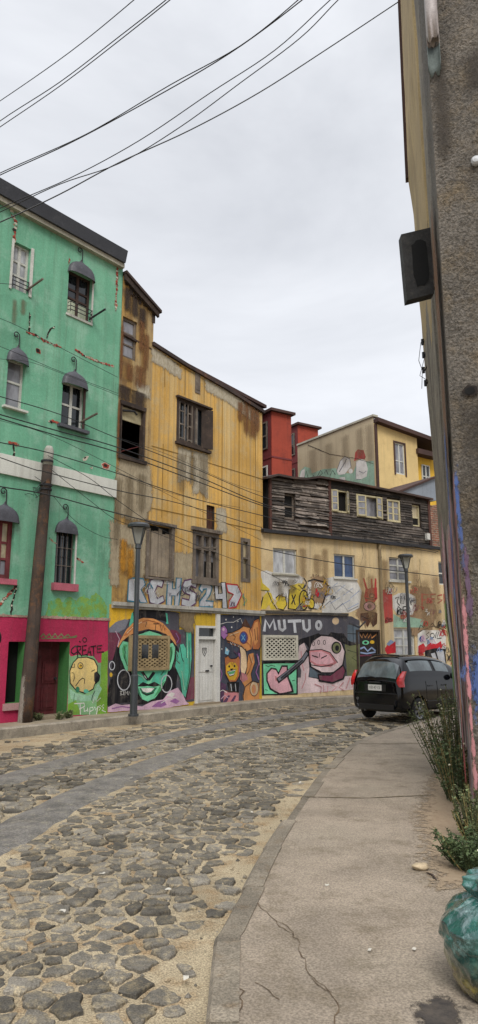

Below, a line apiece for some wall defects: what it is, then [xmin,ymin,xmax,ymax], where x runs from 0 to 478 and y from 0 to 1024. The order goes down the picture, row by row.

rust [119,321,149,387]
crack [258,903,339,1023]